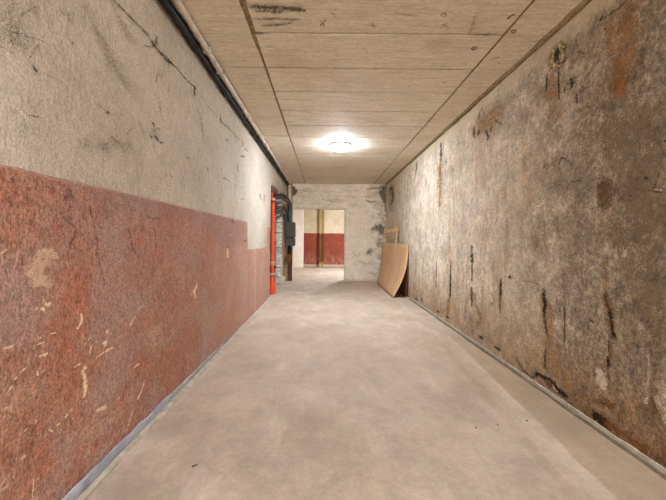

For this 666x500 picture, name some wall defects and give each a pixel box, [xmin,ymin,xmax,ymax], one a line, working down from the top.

crack [118,4,195,95]
peeling [25,247,59,291]
leakage [364,186,395,274]
leakage [534,91,666,335]
rust [603,419,666,465]